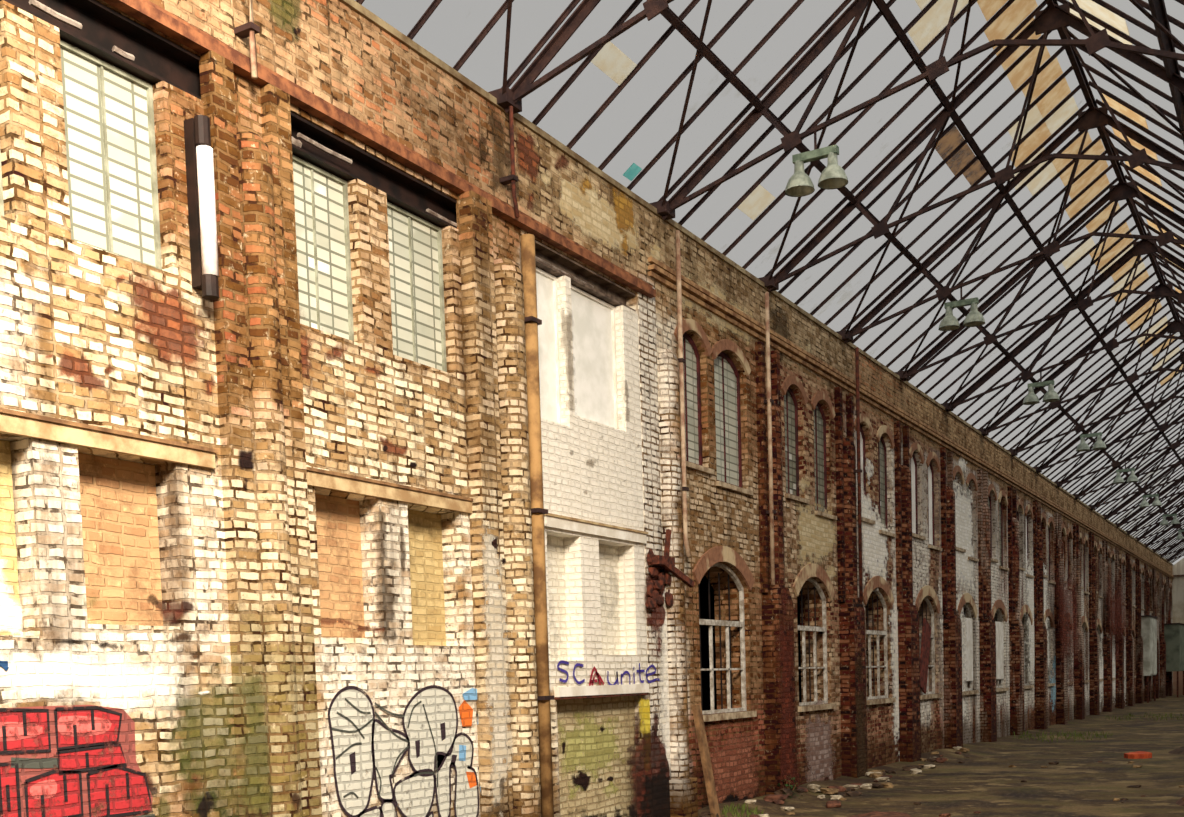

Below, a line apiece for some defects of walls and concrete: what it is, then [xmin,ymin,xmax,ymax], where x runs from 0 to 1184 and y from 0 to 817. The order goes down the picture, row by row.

spalling [47,354,113,390]
peeling [0,559,182,712]
spalling [147,594,194,641]
flaking render [856,459,900,762]